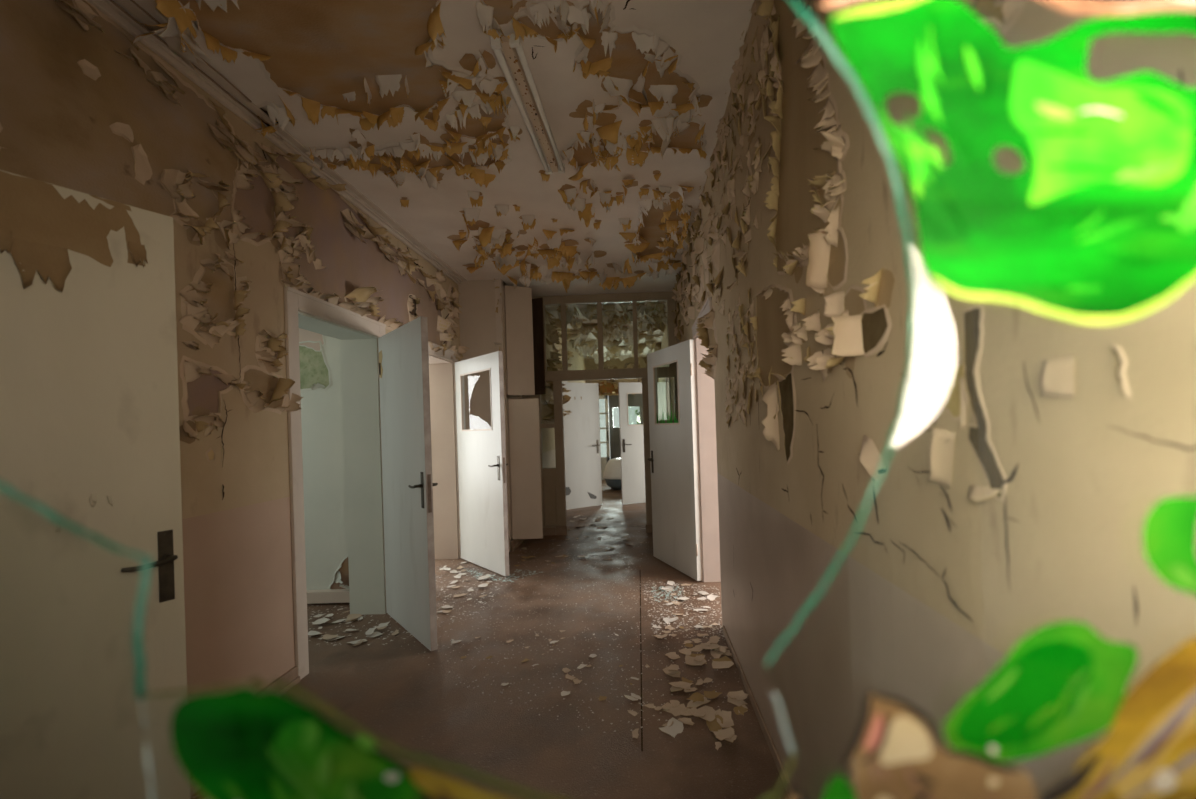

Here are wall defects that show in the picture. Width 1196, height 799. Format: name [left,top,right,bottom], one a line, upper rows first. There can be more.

peeling [0,0,895,464]
crack [783,343,974,622]